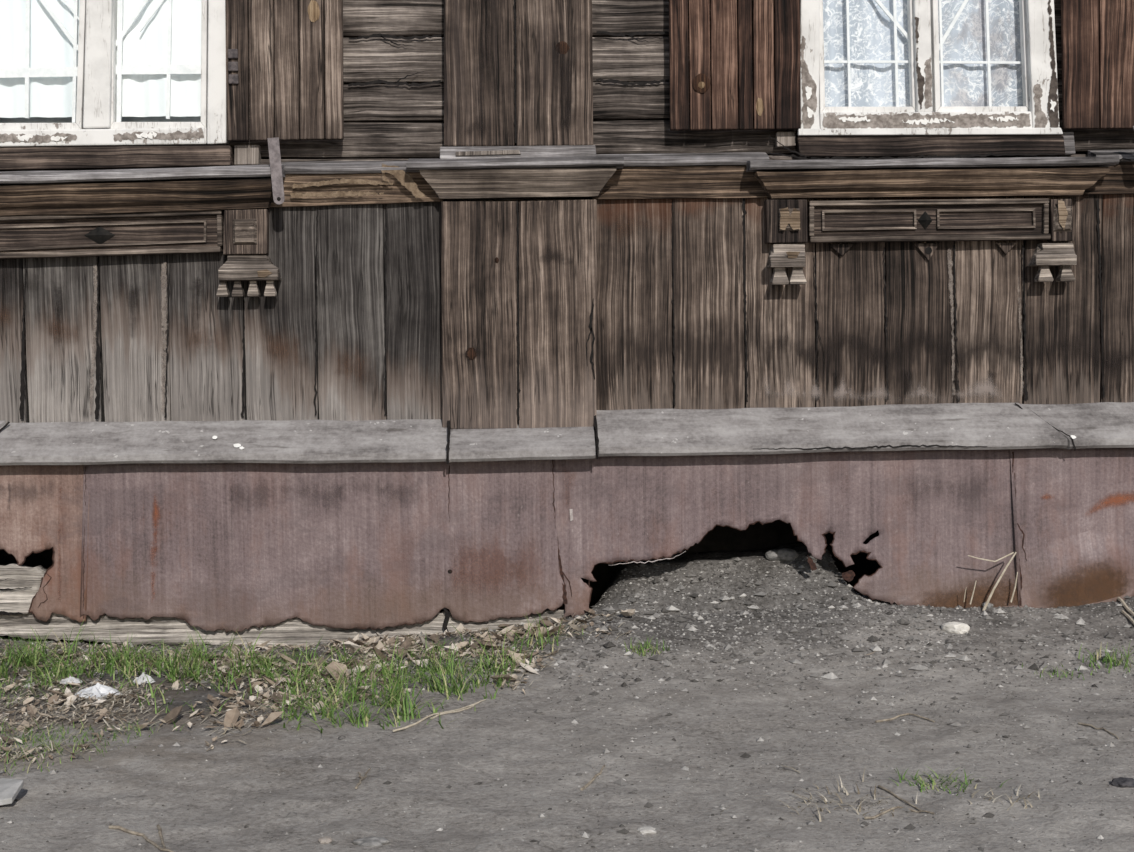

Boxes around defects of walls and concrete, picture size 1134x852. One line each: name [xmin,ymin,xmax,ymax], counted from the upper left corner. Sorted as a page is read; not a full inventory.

peeling [801,0,1060,129]
crack [0,258,26,431]
crack [1015,245,1028,409]
crack [552,460,572,604]
crack [1047,422,1076,451]
corrosion [1091,495,1134,512]